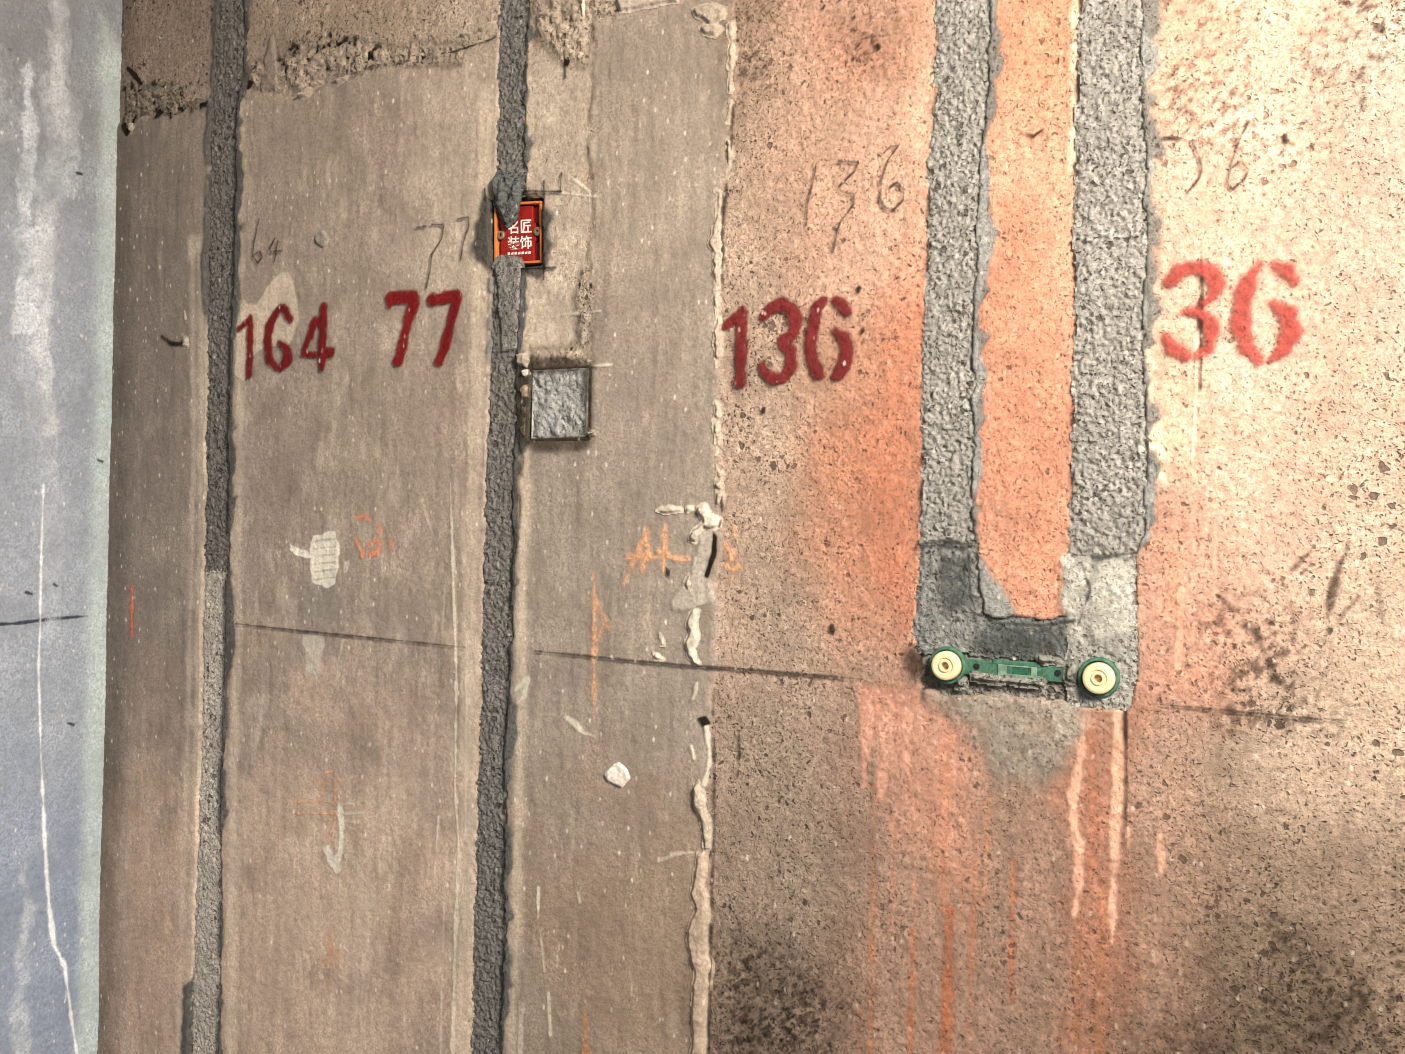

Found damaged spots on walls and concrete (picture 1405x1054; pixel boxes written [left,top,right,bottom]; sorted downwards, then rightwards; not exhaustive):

peeling [531,0,739,369]
spalling [516,267,610,377]
rust [1132,722,1180,852]
rust [870,703,1115,1054]
rust [1143,898,1183,1054]